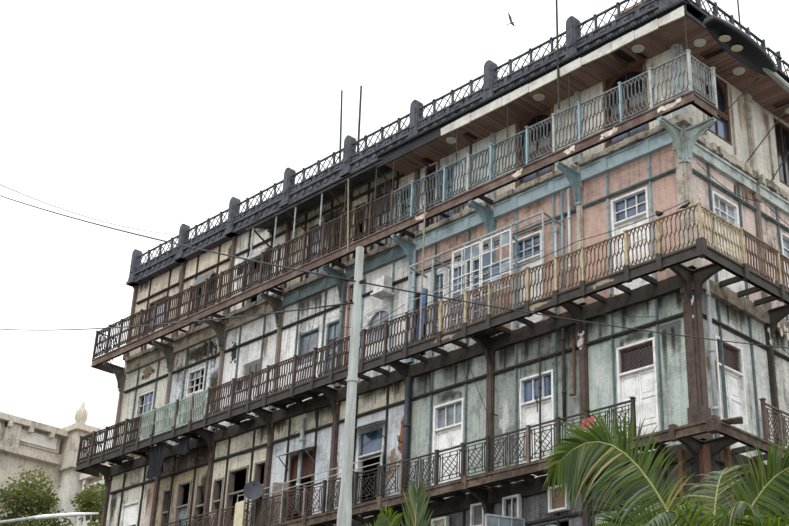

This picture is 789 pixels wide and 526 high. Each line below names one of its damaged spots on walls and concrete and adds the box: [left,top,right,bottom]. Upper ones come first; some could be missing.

peeling [657,97,681,113]
water stain [188,345,217,364]
flaking render [387,417,404,481]